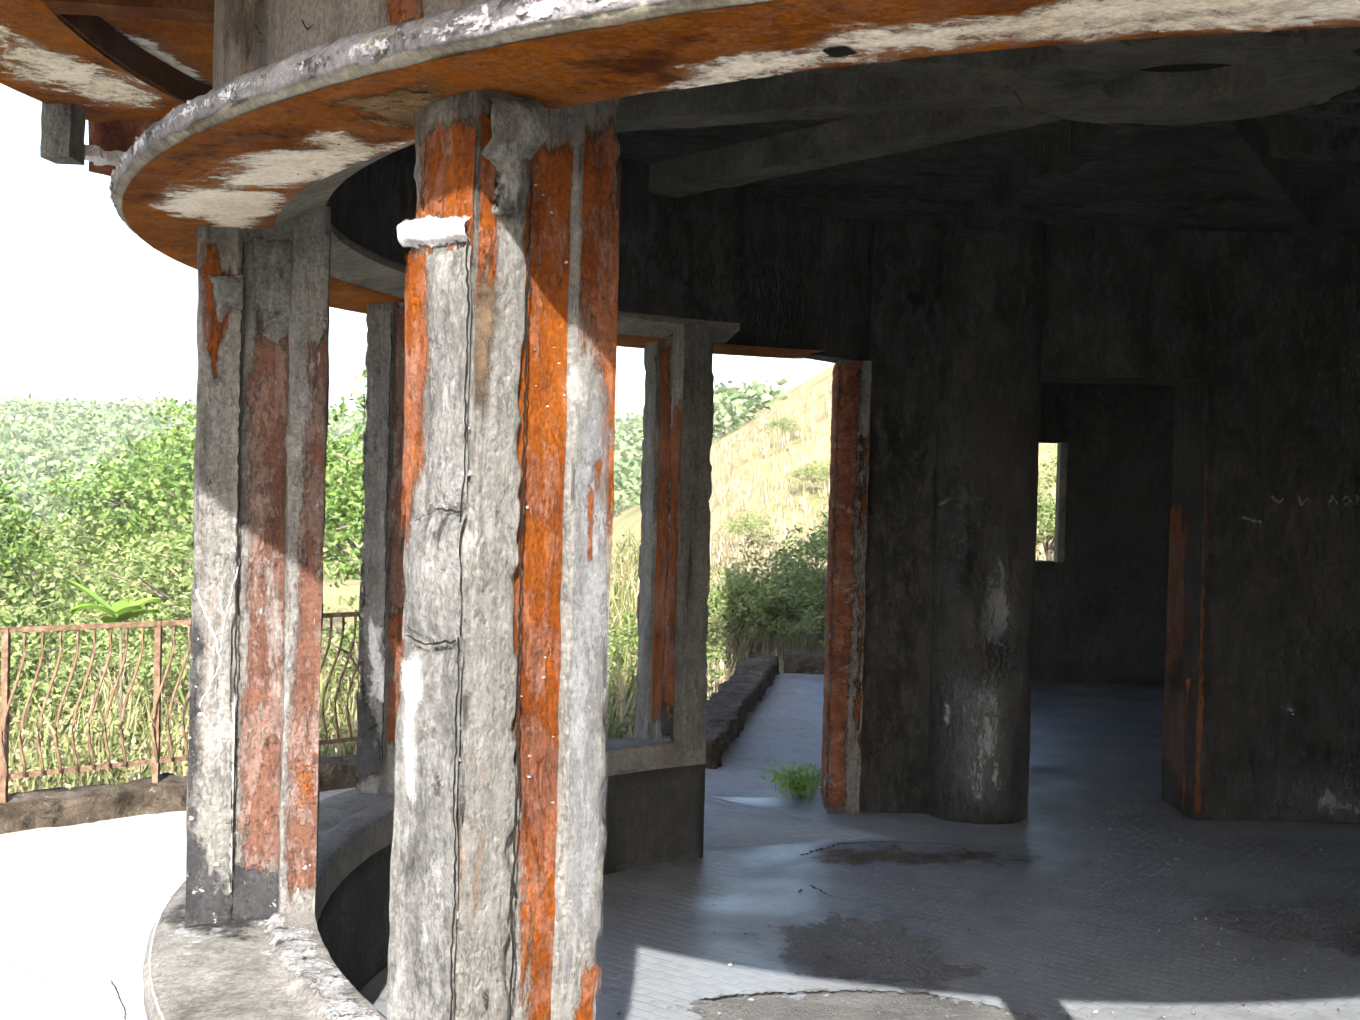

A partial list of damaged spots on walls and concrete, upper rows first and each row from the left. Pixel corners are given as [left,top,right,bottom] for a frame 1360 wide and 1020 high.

crack [195,241,245,894]
rust [237,311,328,902]
peeling [109,0,565,227]
spalling [243,646,464,1020]
crack [381,234,470,1020]
rust [512,117,682,1020]
rust [122,0,1360,765]
rust [1162,380,1209,820]